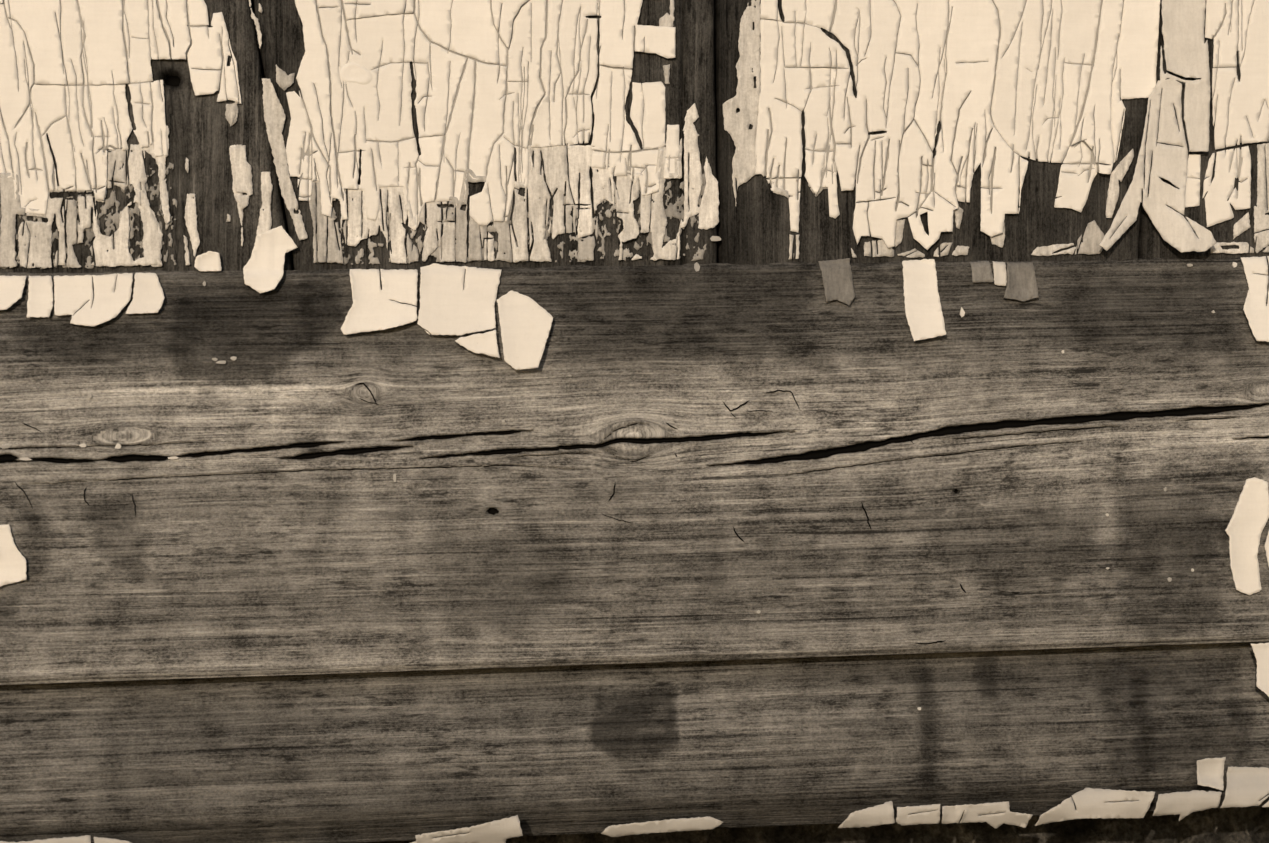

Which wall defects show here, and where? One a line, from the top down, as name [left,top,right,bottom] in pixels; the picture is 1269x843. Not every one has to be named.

peeling [0,0,242,326]
peeling [226,0,1269,370]
crack [0,390,1269,523]
peeling [0,524,27,587]
peeling [1225,477,1269,595]
peeling [1251,643,1269,697]
peeling [0,835,131,843]
peeling [412,815,523,843]
peeling [601,816,723,837]
peeling [838,757,1269,829]